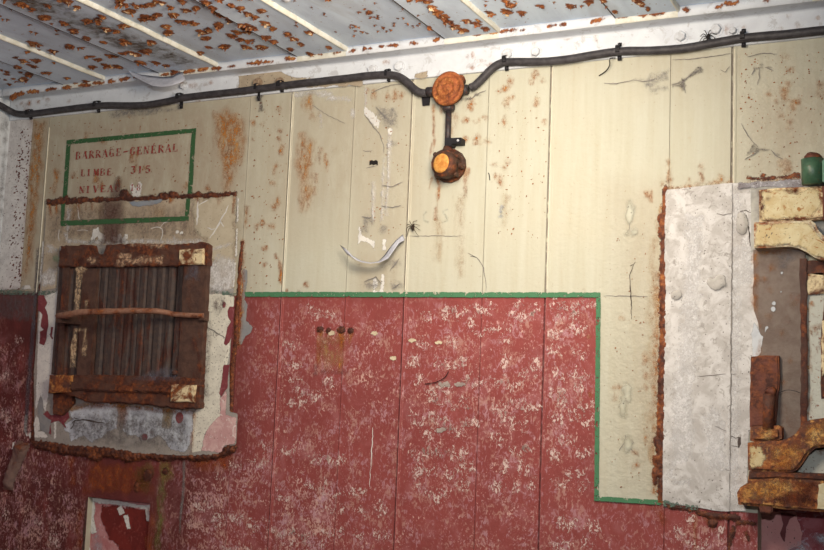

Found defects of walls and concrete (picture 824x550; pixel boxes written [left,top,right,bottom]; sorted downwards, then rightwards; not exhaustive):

corrosion [631,0,665,18]
corrosion [25,123,44,270]
corrosion [209,112,255,201]
corrosion [241,187,283,295]
peeling [34,181,253,453]
corrosion [317,326,354,367]
peeling [729,409,743,499]
peeling [91,497,150,534]